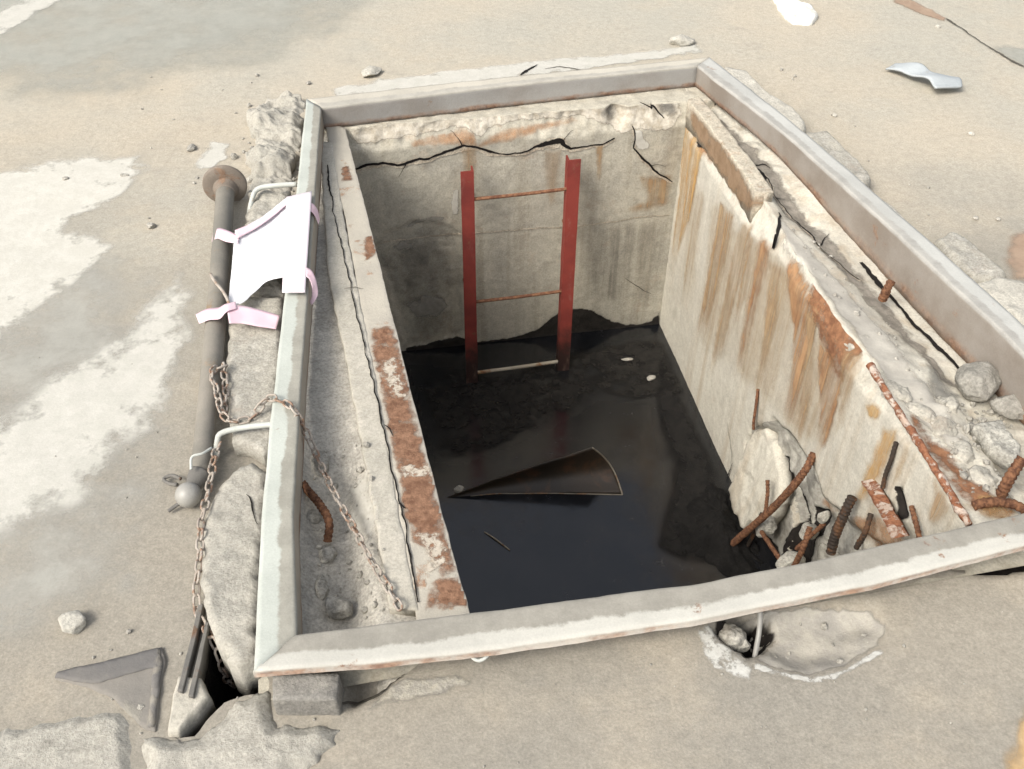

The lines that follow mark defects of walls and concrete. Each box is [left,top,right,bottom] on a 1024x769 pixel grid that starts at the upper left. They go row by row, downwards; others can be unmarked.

crack [945,18,1023,66]
crack [327,165,419,602]
crack [355,102,672,183]
spalling [350,101,681,143]
rust [675,113,763,269]
rust [702,203,862,442]
crack [756,164,959,369]
rust [372,326,467,608]
spalling [728,389,874,566]
spalling [880,441,922,538]
spalling [971,455,1024,514]
spalling [699,607,885,682]